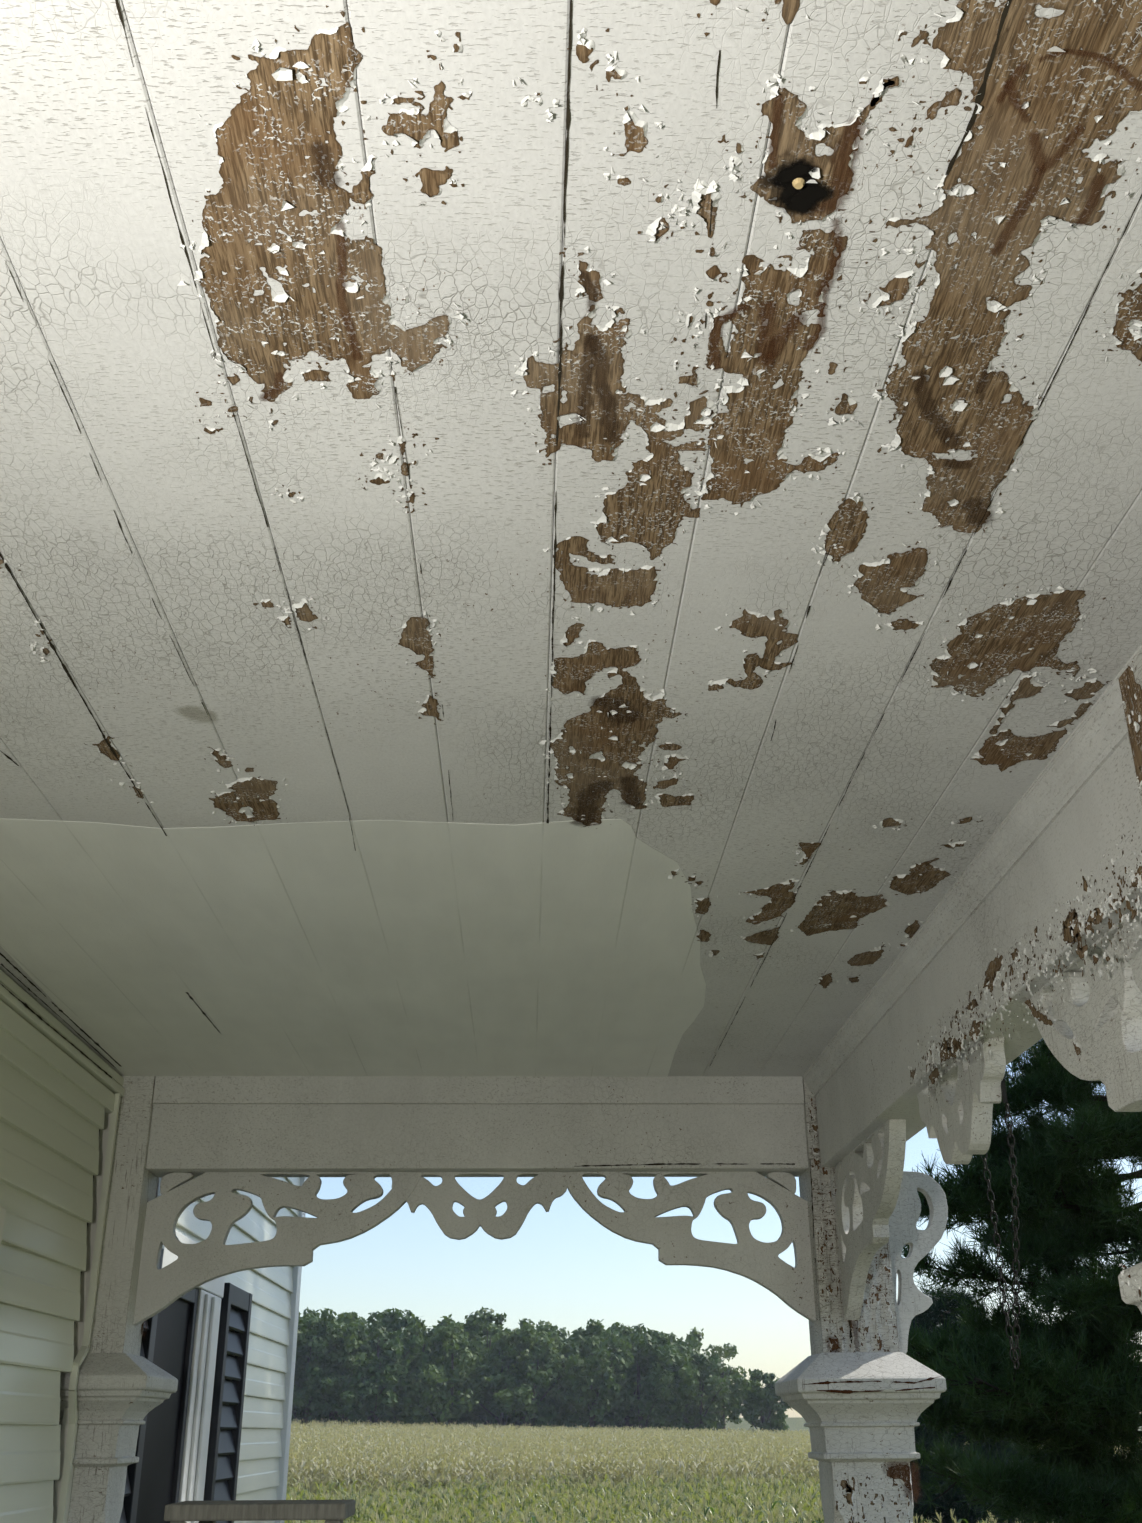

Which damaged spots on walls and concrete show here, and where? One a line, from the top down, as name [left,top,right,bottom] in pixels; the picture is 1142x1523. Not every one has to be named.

peeling [177,5,472,439]
peeling [509,0,1142,829]
peeling [271,485,305,504]
peeling [356,428,439,514]
peeling [204,747,288,826]
peeling [668,869,724,959]
peeling [738,816,984,959]
peeling [813,919,924,989]
peeling [808,1092,897,1353]
peeling [1119,1264,1142,1302]
peeling [835,1462,914,1523]